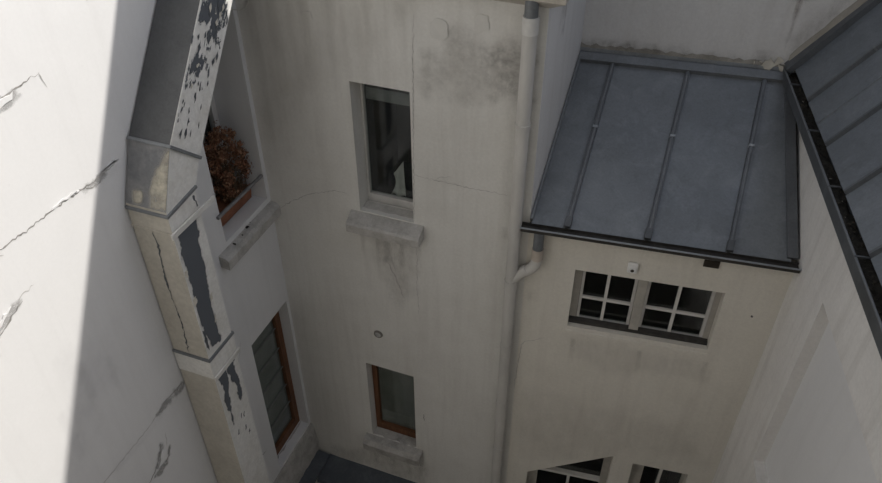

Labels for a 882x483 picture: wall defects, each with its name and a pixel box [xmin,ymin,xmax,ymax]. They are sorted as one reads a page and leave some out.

peeling [177,0,228,138]
crack [0,159,118,256]
peeling [178,220,221,351]
crack [104,382,184,483]
peeling [218,359,251,435]